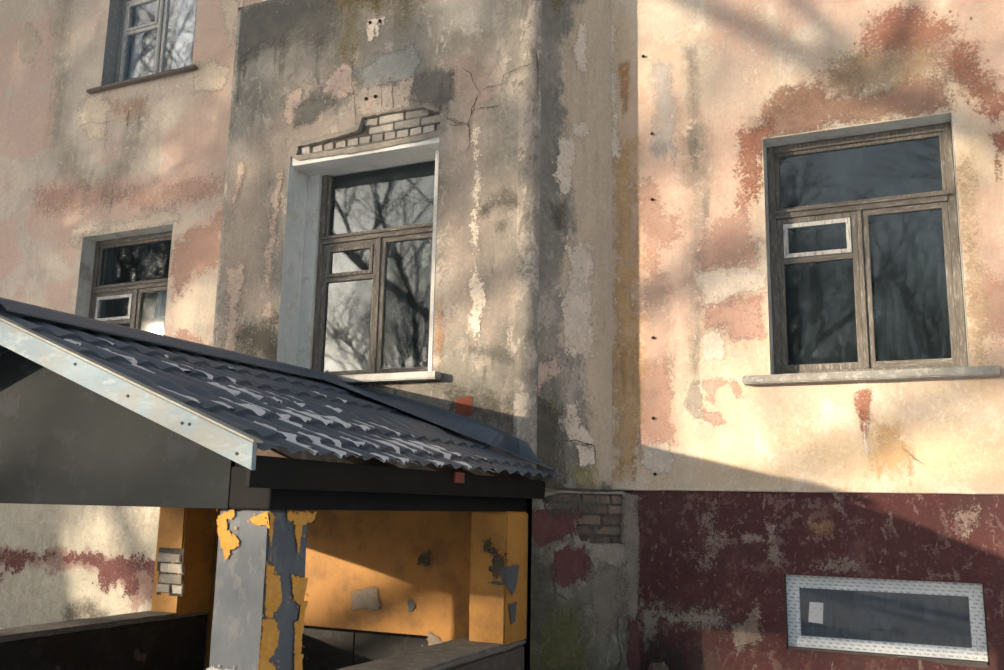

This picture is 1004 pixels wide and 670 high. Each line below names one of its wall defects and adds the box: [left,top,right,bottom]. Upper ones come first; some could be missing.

leakage [237,0,340,96]
flaking render [292,57,445,160]
crack [445,52,539,151]
peeling [66,208,183,251]
peeling [451,53,498,345]
peeling [686,0,1004,366]
peeling [636,354,745,481]
peeling [0,547,185,601]
peeling [216,509,239,560]
peeling [248,511,309,670]
peeling [287,510,316,553]
peeling [532,488,629,587]